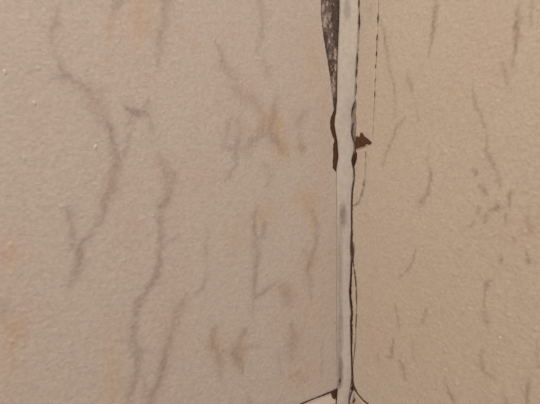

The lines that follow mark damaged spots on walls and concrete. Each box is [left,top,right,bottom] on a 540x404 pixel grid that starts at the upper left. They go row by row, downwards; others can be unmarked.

crack [300,166,368,404]